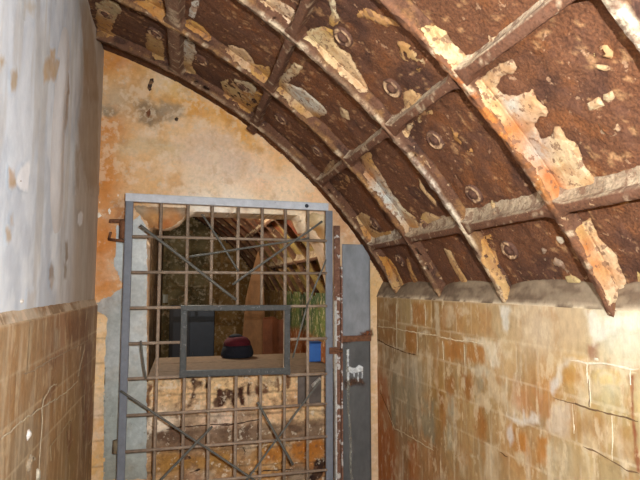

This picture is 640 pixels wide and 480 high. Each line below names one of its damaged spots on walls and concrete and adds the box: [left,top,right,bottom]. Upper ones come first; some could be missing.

peeling [303,0,368,93]
rust [139,85,269,155]
peeling [475,59,594,200]
rust [95,101,131,305]
rust [313,186,360,244]
peeling [575,218,627,306]
damp [377,300,513,403]
efflorescence [581,309,640,350]
crack [2,346,85,479]
damp [504,354,640,472]
crack [555,379,638,422]
crack [585,447,639,474]